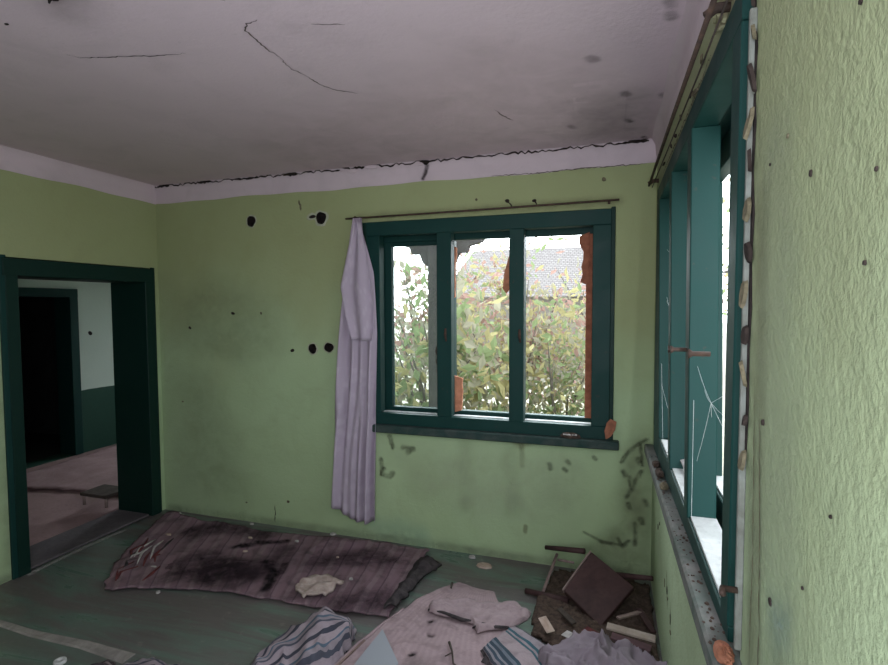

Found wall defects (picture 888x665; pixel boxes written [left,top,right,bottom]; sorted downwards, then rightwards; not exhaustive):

crack [244,20,354,93]
crack [155,54,711,188]
flaking render [712,0,735,35]
flaking render [737,24,758,471]